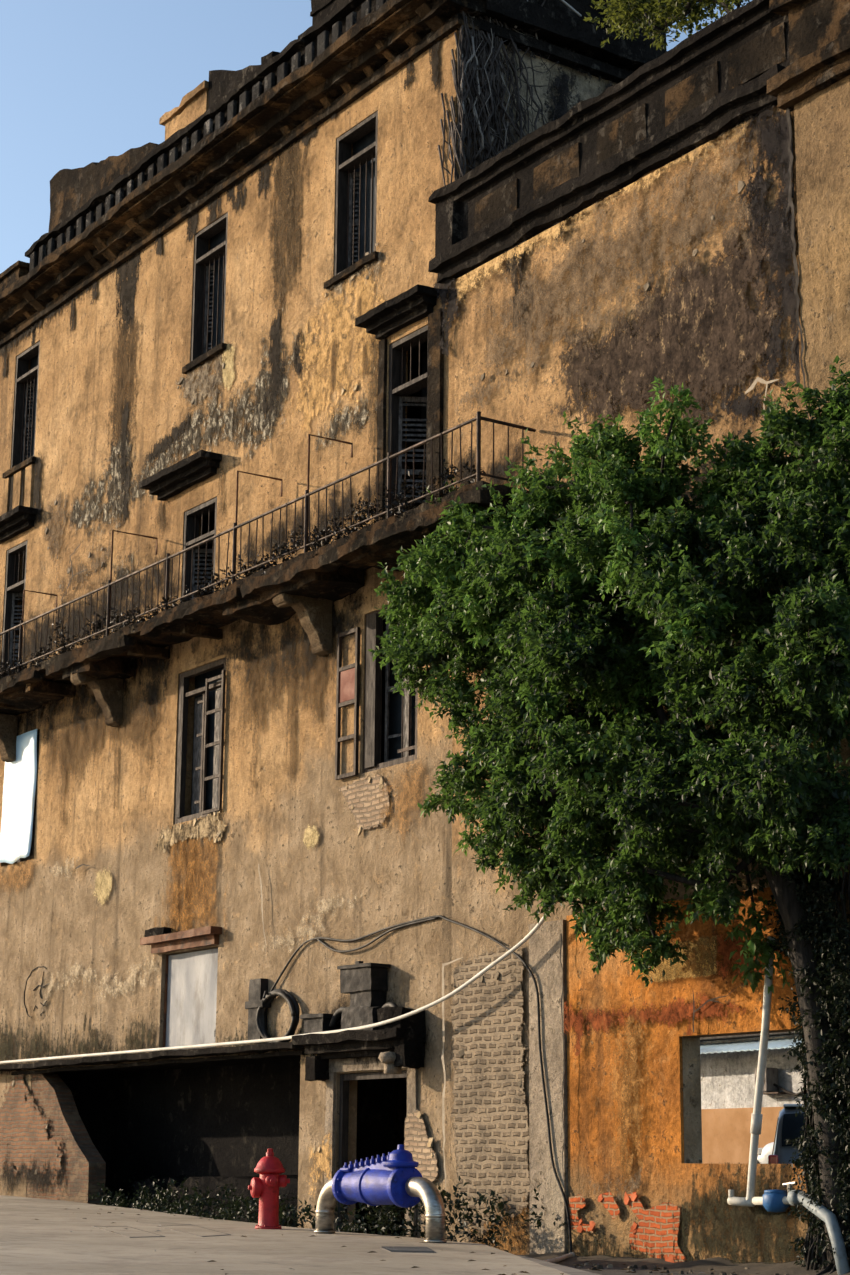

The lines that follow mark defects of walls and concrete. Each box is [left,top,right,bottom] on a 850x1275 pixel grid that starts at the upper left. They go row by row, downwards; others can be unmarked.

water stain [425,30,448,92]
water stain [546,104,800,442]
water stain [0,127,318,536]
water stain [22,547,180,667]
spalling [154,811,226,853]
spalling [339,773,389,836]
flaking render [0,1070,66,1184]
water stain [0,1005,157,1081]
spalling [404,1110,438,1182]
flaking render [449,943,530,1240]
rust [564,919,764,1182]
flaking render [569,1191,685,1263]